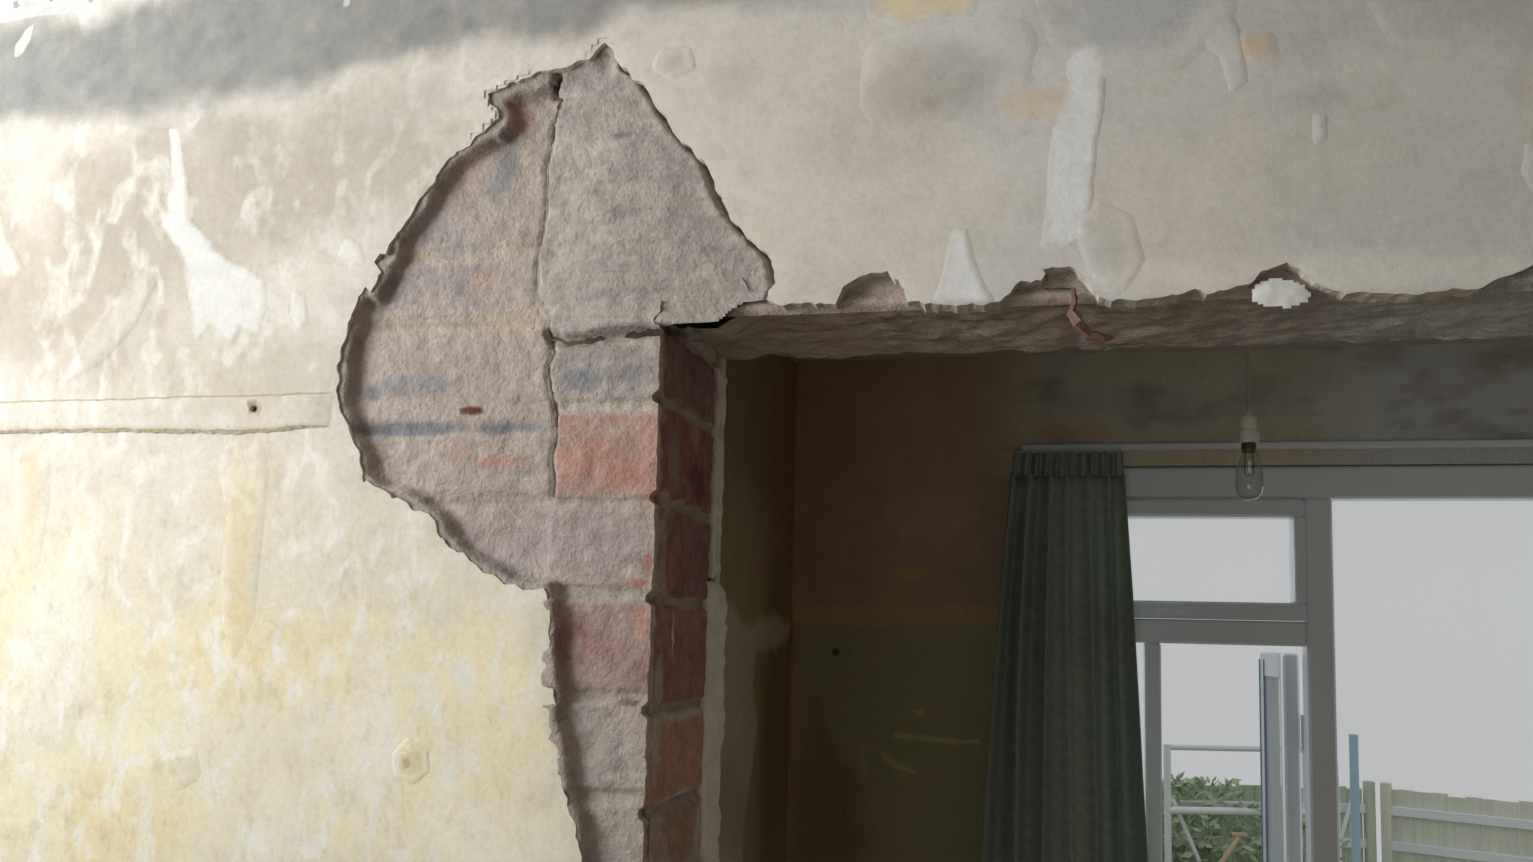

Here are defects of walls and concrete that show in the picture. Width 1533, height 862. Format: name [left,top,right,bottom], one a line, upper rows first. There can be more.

water stain [0,0,866,242]
crack [536,73,701,498]
spalling [337,46,1533,862]